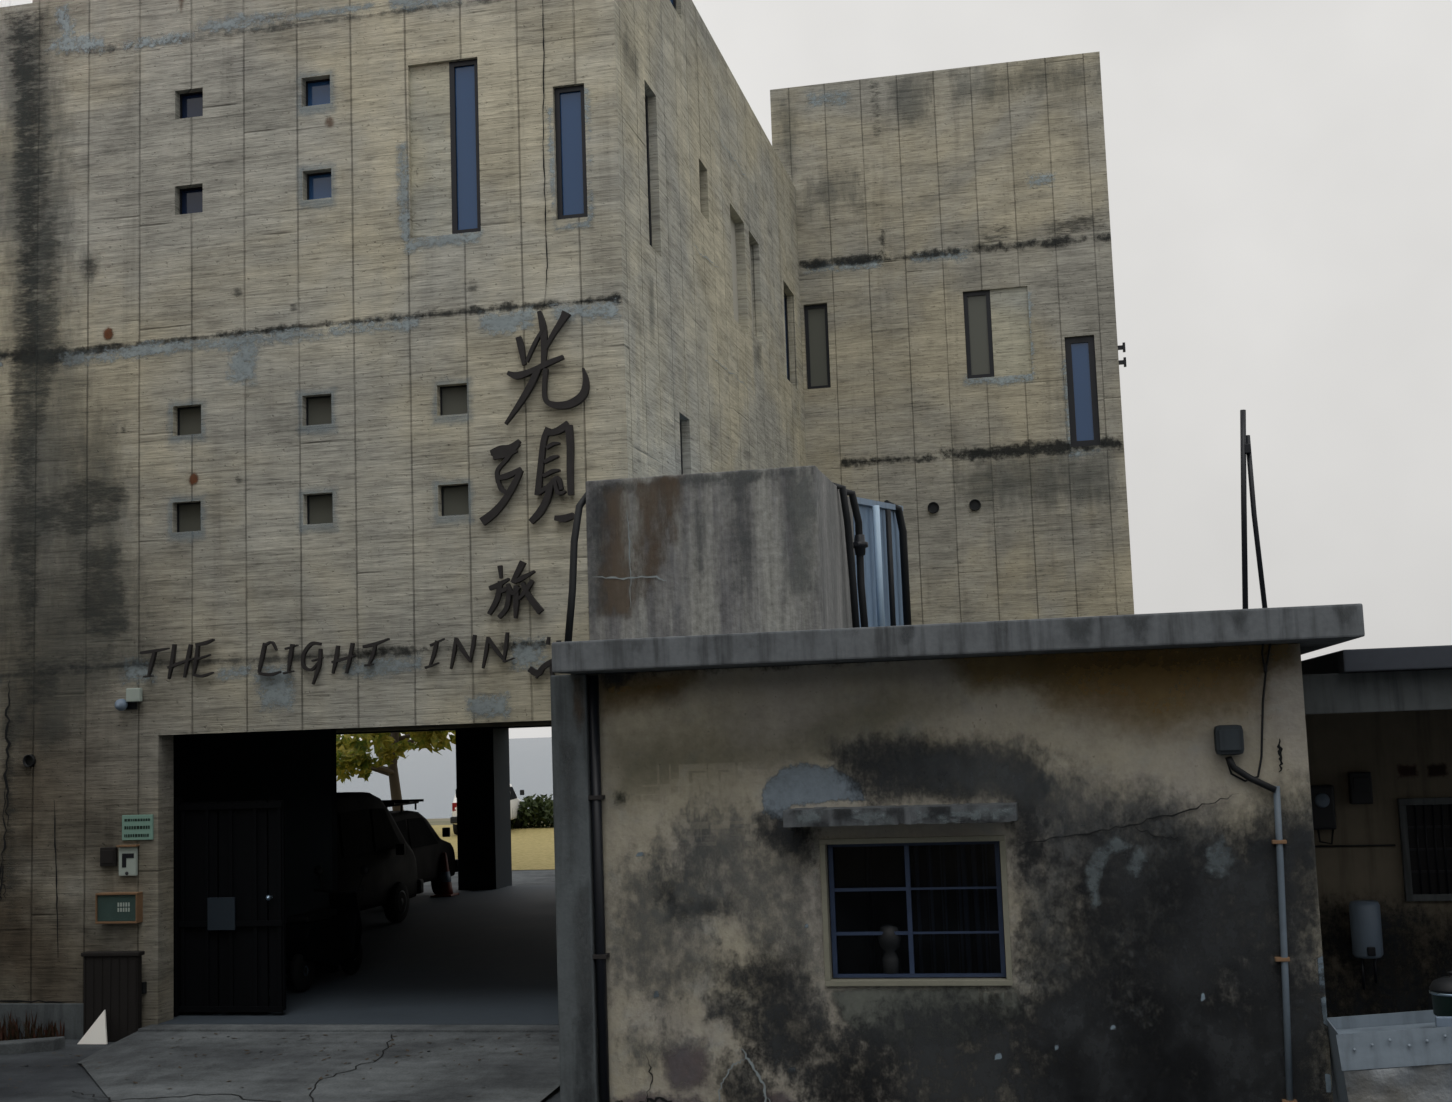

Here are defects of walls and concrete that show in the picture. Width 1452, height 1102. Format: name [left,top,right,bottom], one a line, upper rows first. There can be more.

damp [0,14,418,645]
damp [481,308,536,334]
damp [554,302,618,320]
crack [353,646,425,658]
crack [501,641,545,649]
crack [0,662,169,900]
peeling [762,763,889,822]
crack [1020,798,1228,846]
damp [614,738,1452,1102]
crack [615,1056,672,1102]
crack [718,1048,771,1102]